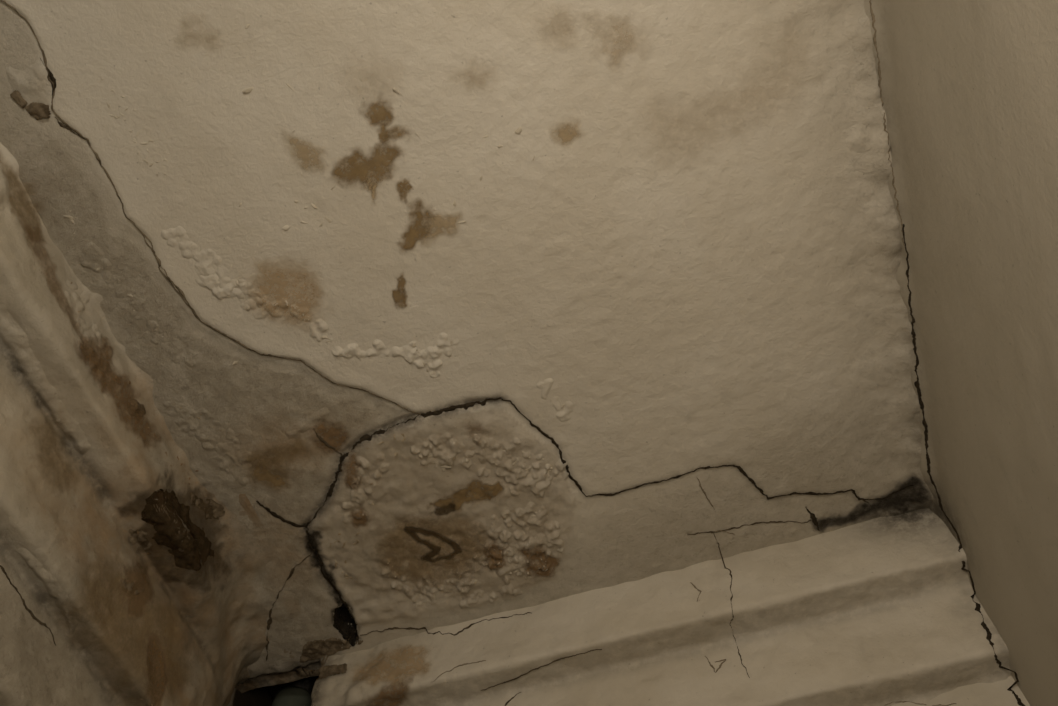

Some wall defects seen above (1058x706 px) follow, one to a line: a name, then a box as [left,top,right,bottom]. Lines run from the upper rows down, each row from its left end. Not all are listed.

peeling [6,58,52,121]
water stain [333,103,458,250]
water stain [392,275,407,307]
crack [0,0,913,609]
crack [869,0,1025,706]
crack [0,565,56,646]
spalling [123,489,225,571]
water stain [385,480,504,577]
crack [360,612,530,636]
water stain [522,547,559,576]
crack [688,507,819,678]
crack [481,649,602,706]